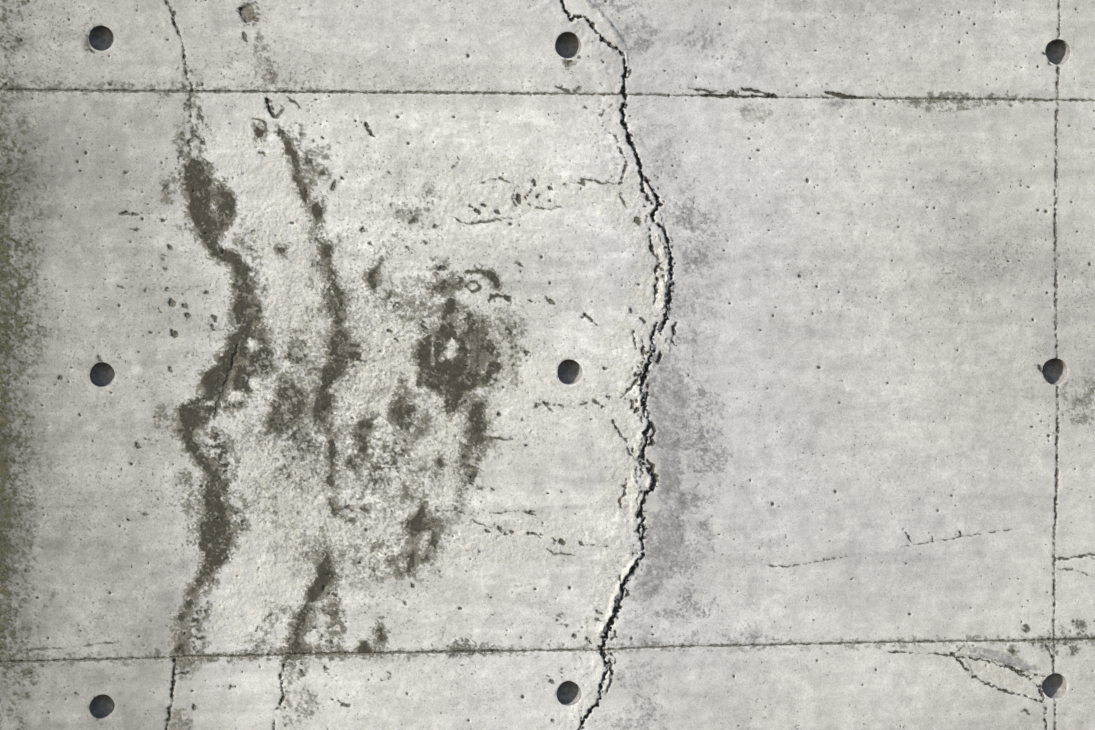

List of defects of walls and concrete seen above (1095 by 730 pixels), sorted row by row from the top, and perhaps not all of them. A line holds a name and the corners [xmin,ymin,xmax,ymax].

crack [165,0,188,80]
damp [154,60,525,670]
crack [560,0,677,730]
crack [905,529,1010,546]
crack [1057,553,1095,576]
crack [166,658,190,730]
crack [273,664,304,730]